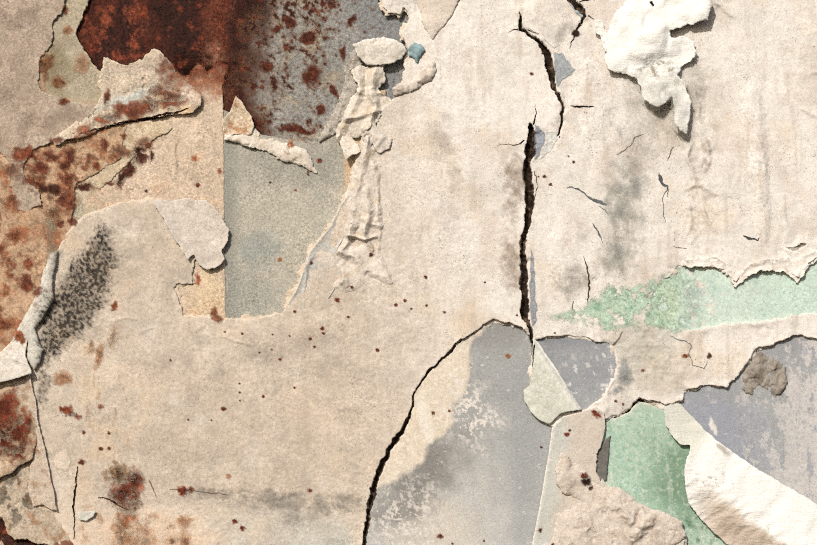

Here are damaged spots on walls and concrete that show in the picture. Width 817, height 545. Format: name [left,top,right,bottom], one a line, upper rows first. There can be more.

corrosion [63,0,341,147]
crack [510,13,594,138]
crack [567,0,595,46]
peeling [594,0,712,134]
corrosion [7,137,100,228]
leakage [38,226,116,361]
corrosion [101,134,154,188]
peeling [72,65,361,319]
crack [505,108,538,367]
crack [362,328,481,545]
peeling [366,251,617,545]
peeling [655,335,817,545]